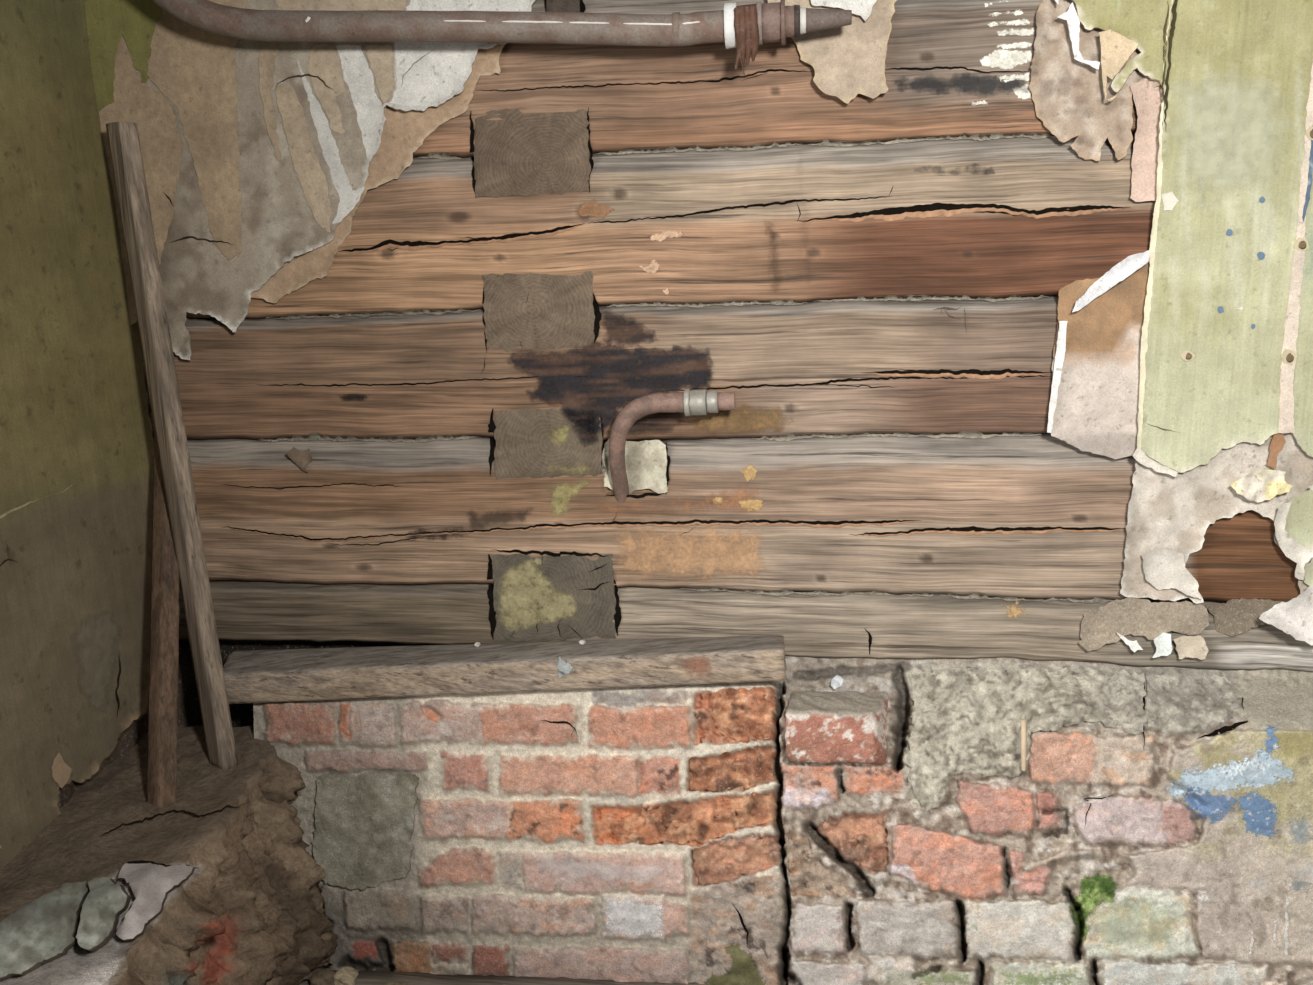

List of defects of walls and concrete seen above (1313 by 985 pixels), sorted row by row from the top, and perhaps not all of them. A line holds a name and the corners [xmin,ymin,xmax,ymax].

flaking render [405,0,536,12]
flaking render [811,0,877,22]
crack [1161,0,1178,129]
flaking render [84,0,507,361]
crack [339,187,1130,254]
peeling [1029,0,1313,646]
peeling [51,753,72,788]
spalling [607,686,779,885]